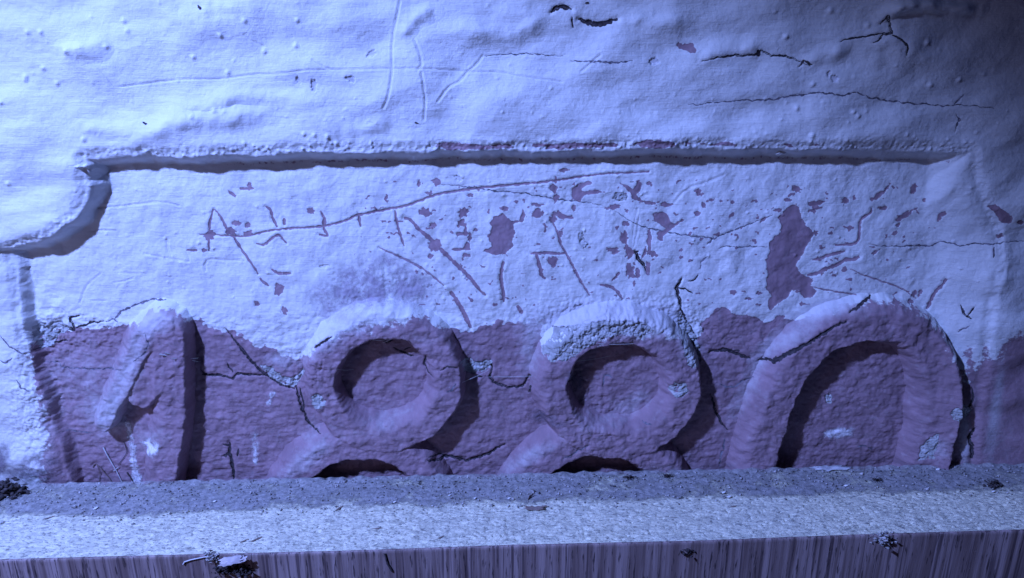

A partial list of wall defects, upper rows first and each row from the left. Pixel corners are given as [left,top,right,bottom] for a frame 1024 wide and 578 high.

crack [551,4,618,28]
crack [840,15,909,56]
crack [702,49,812,67]
crack [688,92,990,130]
peeling [417,168,715,282]
peeling [678,185,825,369]
peeling [274,283,288,315]
spalling [32,321,72,349]
spalling [541,320,653,362]
crack [440,184,871,466]
crack [201,328,321,434]
spalling [260,365,305,387]